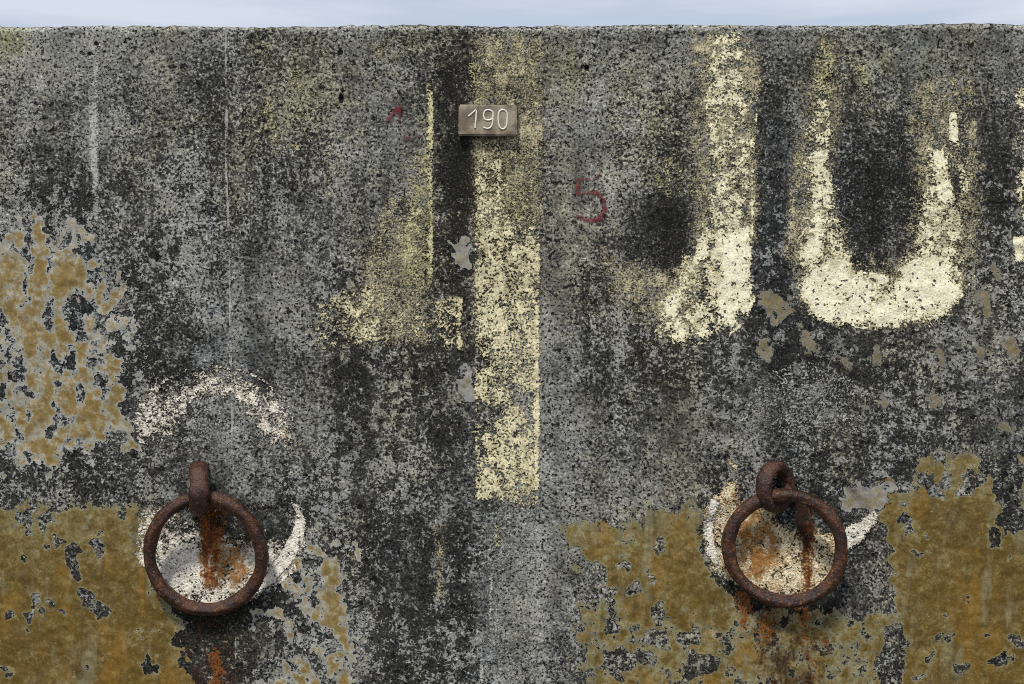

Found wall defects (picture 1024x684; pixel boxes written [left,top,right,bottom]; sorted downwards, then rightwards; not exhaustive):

damp [447,233,475,272]
damp [454,362,475,403]
spalling [736,354,878,447]
rust [197,506,251,594]
damp [433,523,445,604]
rust [737,509,783,582]
spalling [701,458,879,595]
rust [795,503,817,592]
rust [187,619,235,684]
damp [246,532,368,684]
rust [734,591,831,684]